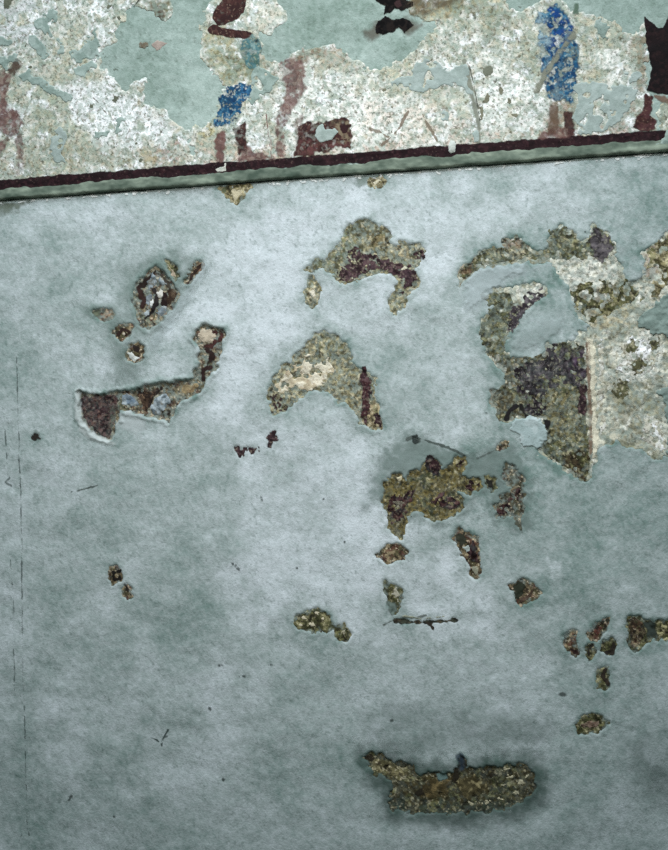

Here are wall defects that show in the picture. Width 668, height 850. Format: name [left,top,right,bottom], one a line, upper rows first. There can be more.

peeling [0,0,668,180]
spalling [92,259,205,363]
spalling [303,219,426,316]
spalling [75,324,226,444]
spalling [266,330,383,430]
spalling [293,608,352,642]
spalling [375,455,527,565]
spalling [451,527,482,579]
spalling [508,578,543,607]
spalling [563,616,668,661]
spalling [575,713,610,735]
spalling [363,751,537,816]